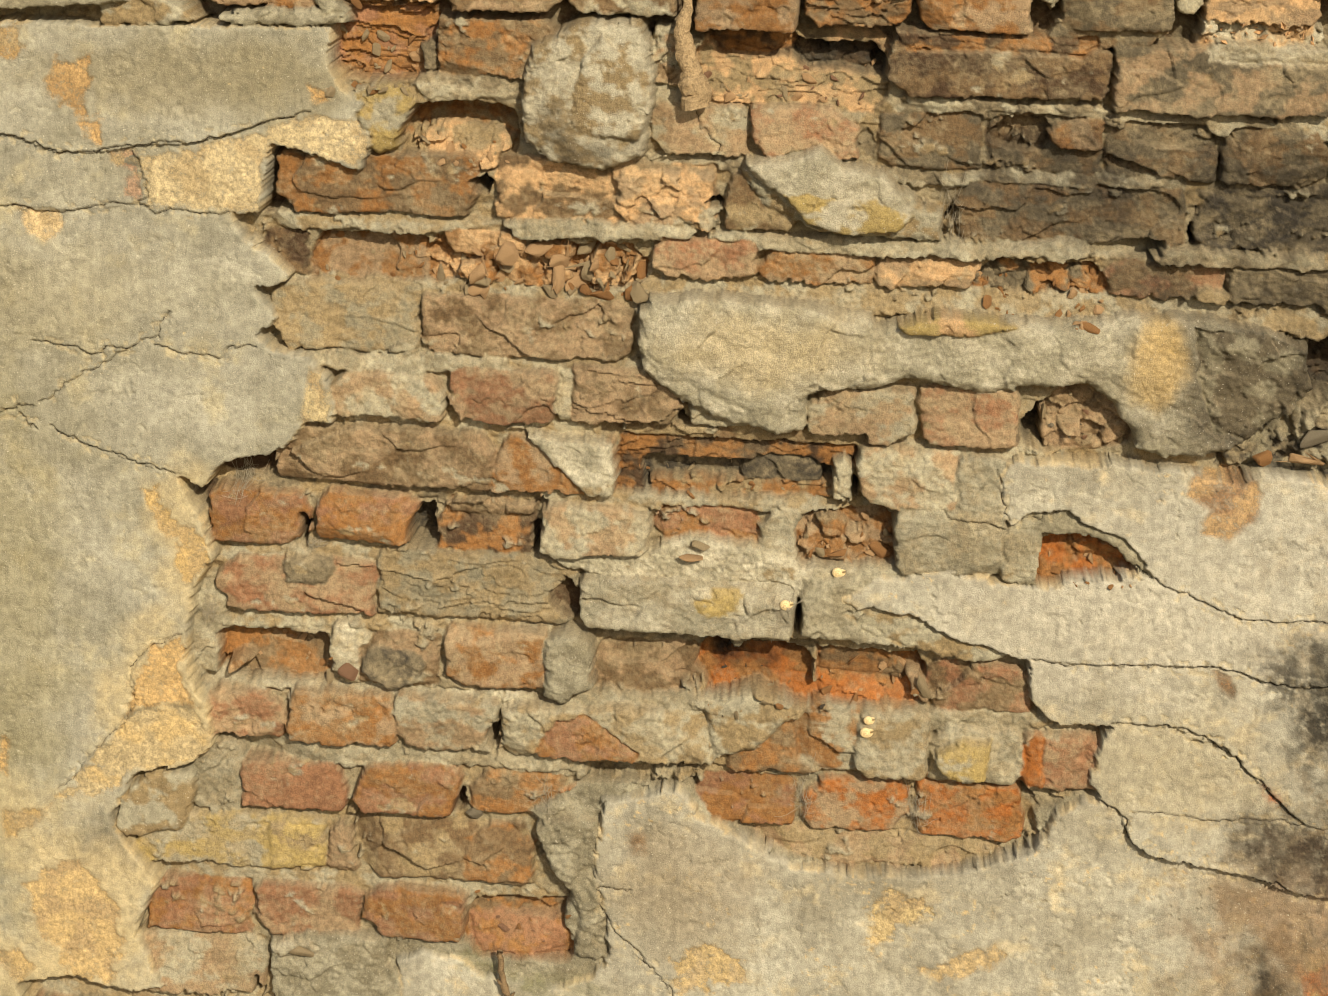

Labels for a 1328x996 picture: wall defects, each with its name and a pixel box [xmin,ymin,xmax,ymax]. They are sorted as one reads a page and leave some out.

spalling [337,0,521,169]
spalling [697,24,891,112]
crack [6,112,309,215]
spalling [312,228,649,304]
crack [1,316,250,473]
spalling [616,431,894,562]
spalling [1037,533,1132,590]
spalling [222,625,359,684]
damp [1271,656,1328,752]
crack [1098,724,1326,844]
damp [1244,826,1328,894]
crack [596,886,673,996]